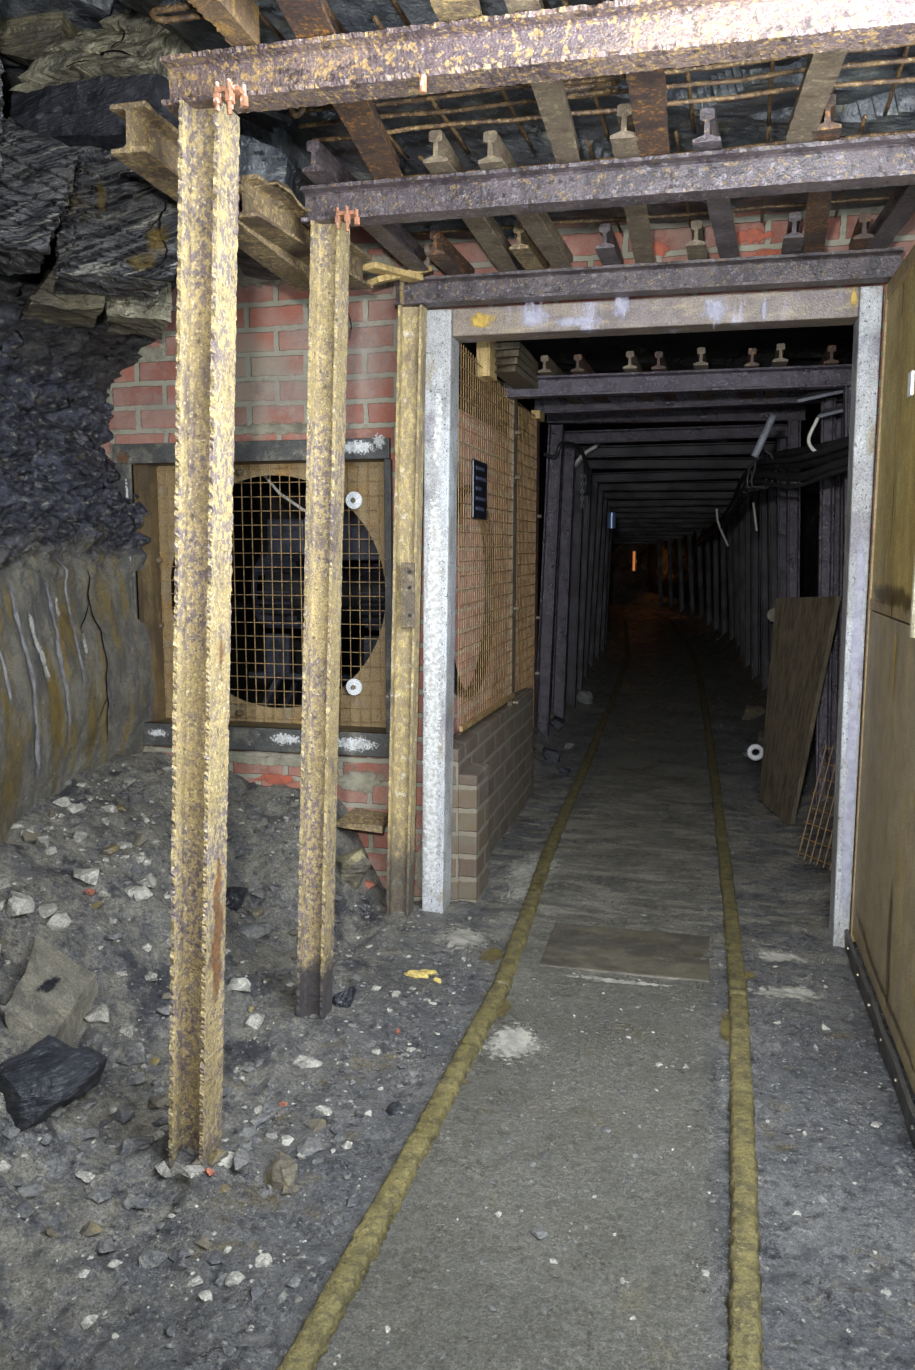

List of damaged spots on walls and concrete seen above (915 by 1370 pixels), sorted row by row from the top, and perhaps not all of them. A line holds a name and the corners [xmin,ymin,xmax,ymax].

rust [212,860,222,1002]